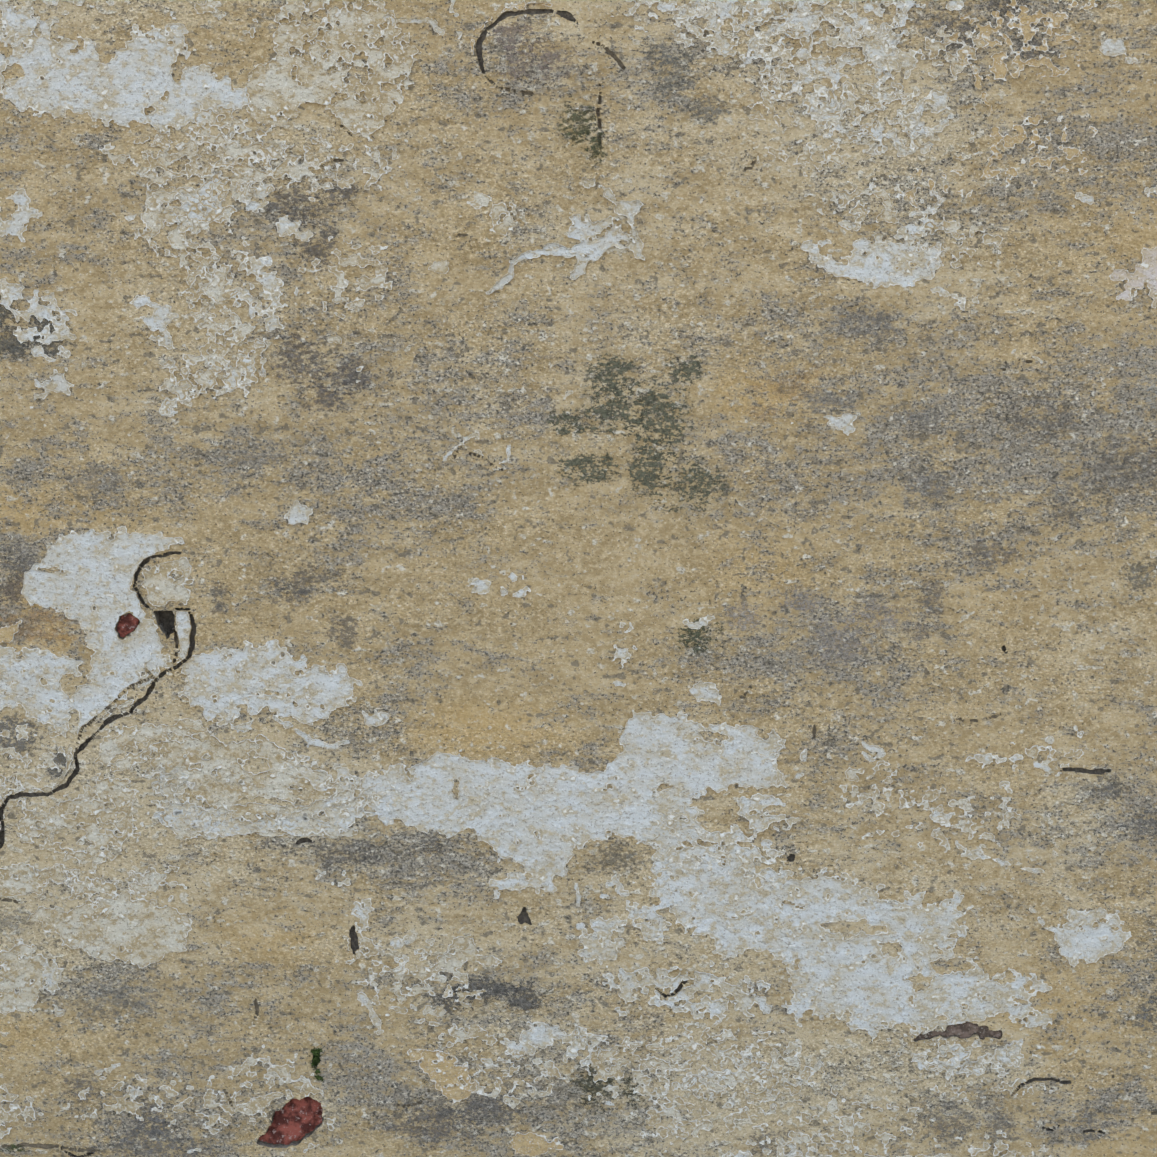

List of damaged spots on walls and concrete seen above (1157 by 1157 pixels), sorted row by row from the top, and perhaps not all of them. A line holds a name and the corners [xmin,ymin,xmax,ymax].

crack [476,9,625,145]
peeling [1100,38,1138,64]
peeling [0,0,552,417]
peeling [467,177,645,294]
peeling [611,0,1117,314]
peeling [1109,247,1157,308]
water stain [546,353,730,513]
crack [0,551,196,849]
peeling [0,526,1084,1157]
peeling [1029,907,1132,967]
crack [1,1142,98,1157]